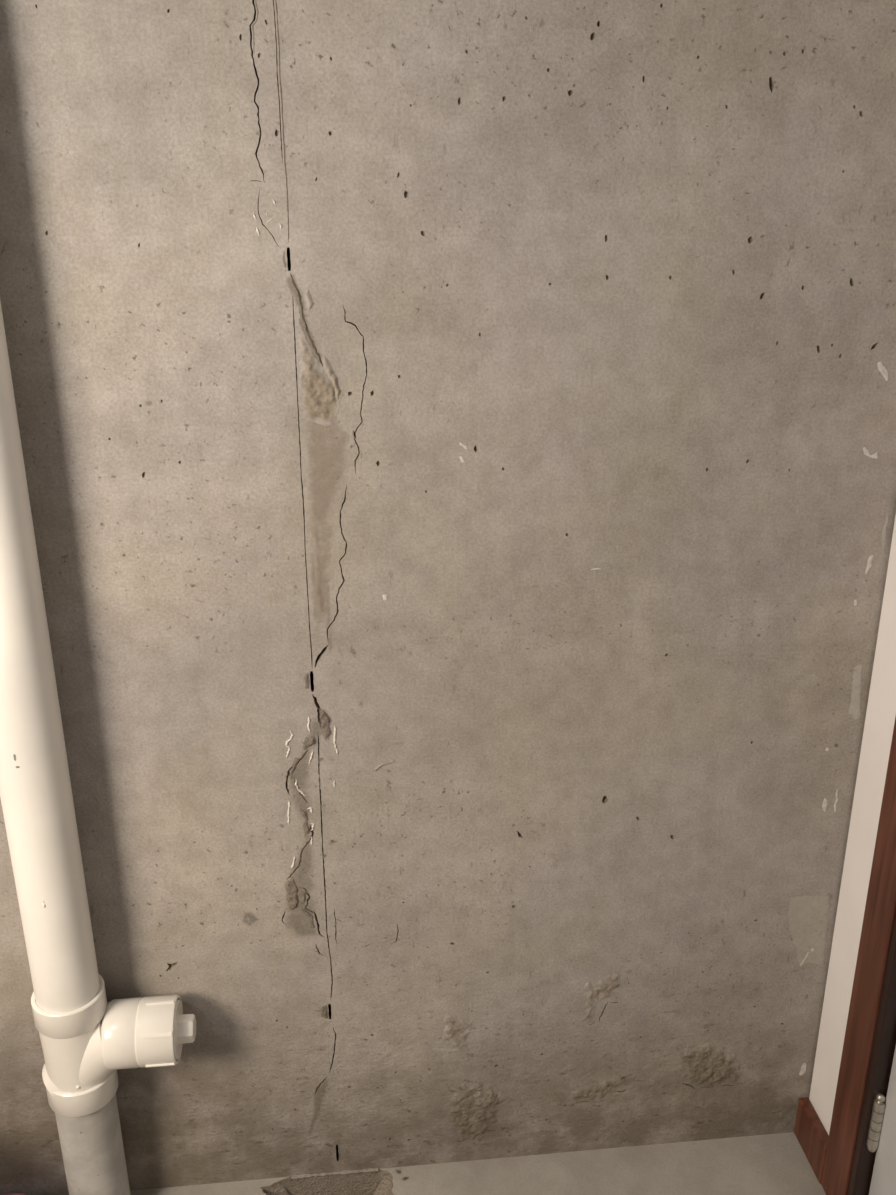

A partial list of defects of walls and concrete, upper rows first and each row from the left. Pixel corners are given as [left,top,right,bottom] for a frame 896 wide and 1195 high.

crack [249,0,278,245]
crack [315,306,367,667]
peeling [282,674,330,956]
crack [315,1028,336,1094]